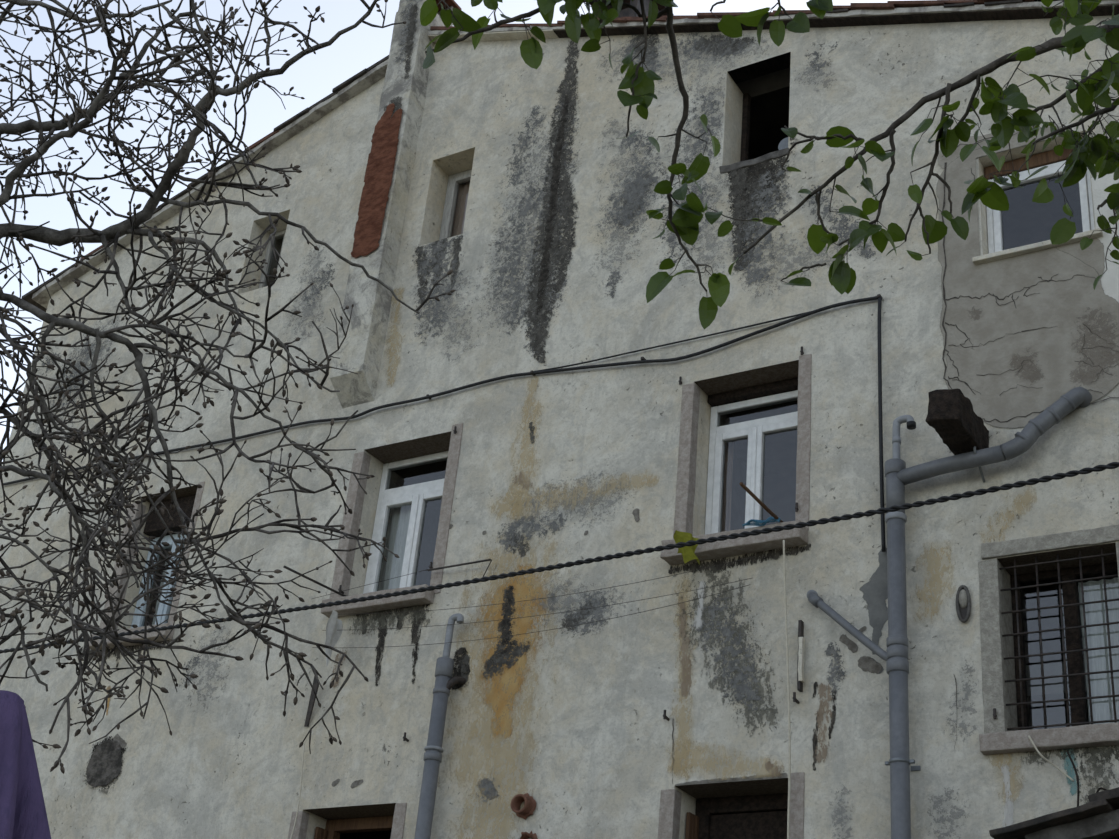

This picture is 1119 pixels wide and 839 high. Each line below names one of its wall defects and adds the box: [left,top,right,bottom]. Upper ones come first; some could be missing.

spalling [351,96,403,258]
damp [412,236,466,345]
damp [489,41,582,363]
damp [600,129,714,266]
damp [727,137,877,289]
crack [942,140,1096,423]
crack [1075,324,1119,404]
damp [497,511,567,557]
damp [349,604,432,686]
damp [547,590,612,637]
damp [668,544,811,736]
spalling [84,734,126,793]